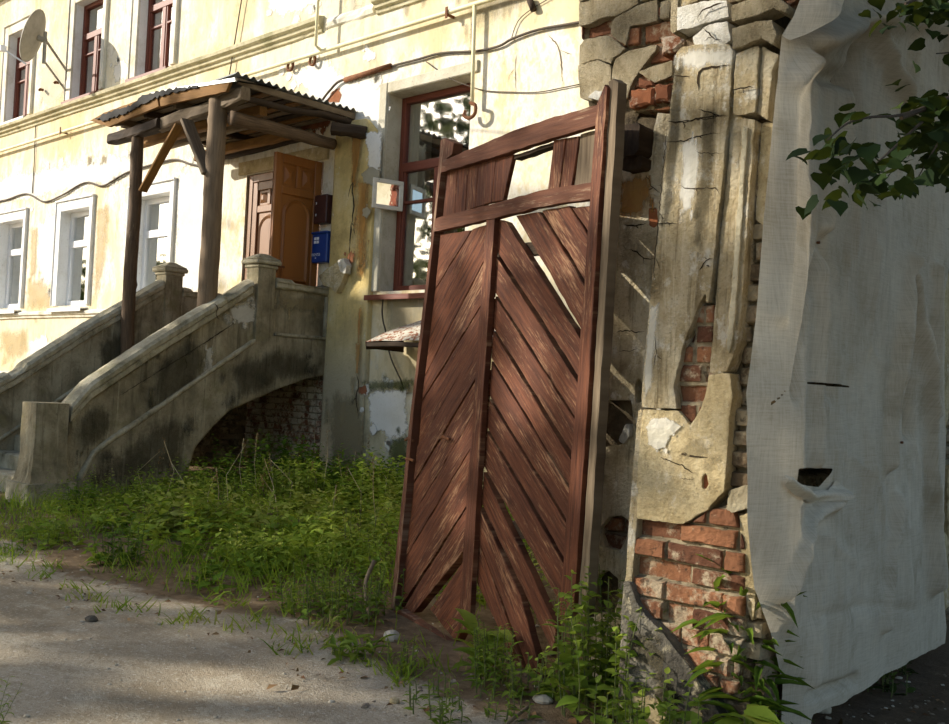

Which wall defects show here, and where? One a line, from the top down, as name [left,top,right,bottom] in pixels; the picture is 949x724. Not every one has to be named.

peeling [266,0,321,24]
crack [697,3,722,41]
corrosion [620,176,654,216]
crack [624,65,727,298]
damp [101,337,121,366]
damp [144,342,212,407]
damp [229,352,317,407]
spalling [646,305,716,454]
damp [71,409,109,467]
damp [103,421,193,493]
peeling [358,377,408,452]
spalling [634,504,750,695]